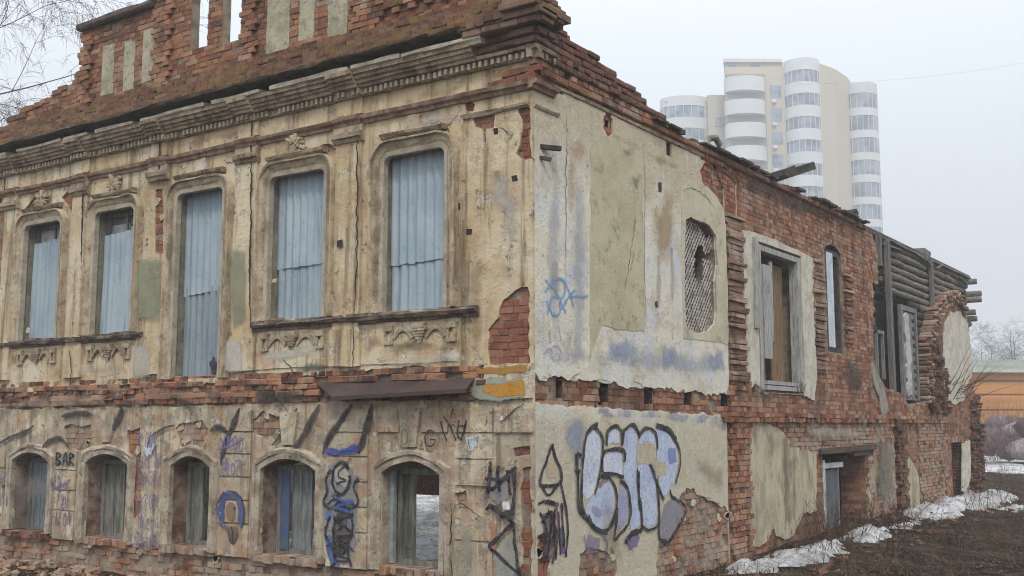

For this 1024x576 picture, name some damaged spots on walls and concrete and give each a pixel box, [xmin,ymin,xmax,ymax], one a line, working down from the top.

crack [224,121,253,322]
crack [351,139,359,366]
crack [625,166,646,313]
spalling [470,287,530,402]
spalling [579,547,616,576]
spalling [655,488,739,576]